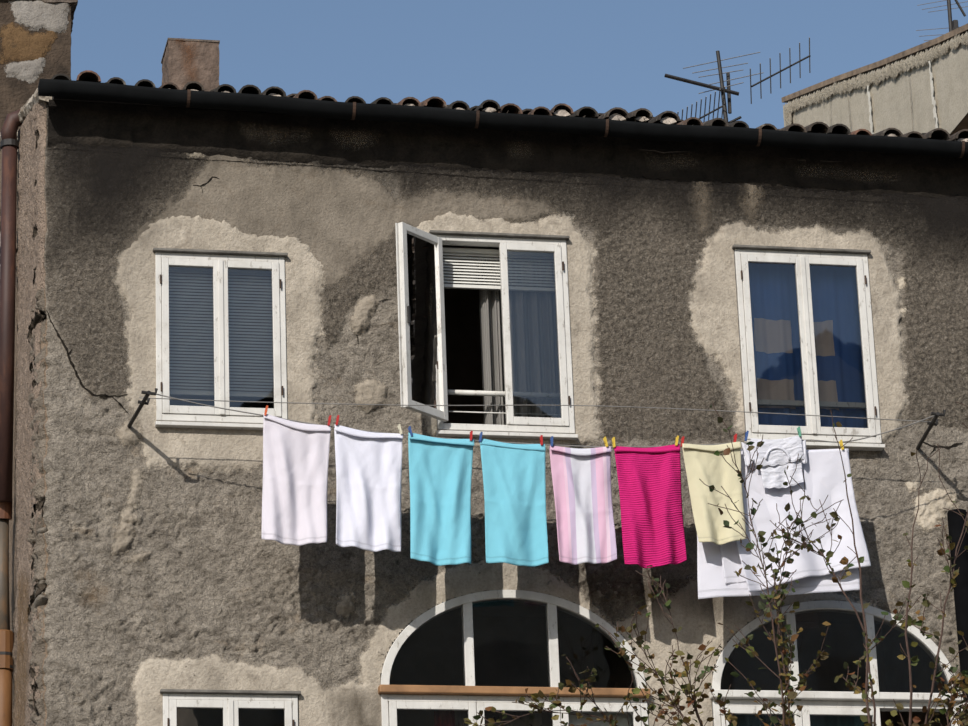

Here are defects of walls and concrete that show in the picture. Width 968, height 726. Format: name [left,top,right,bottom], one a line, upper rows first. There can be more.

peeling [0,22,58,64]
crack [46,310,129,414]
spalling [27,267,48,726]